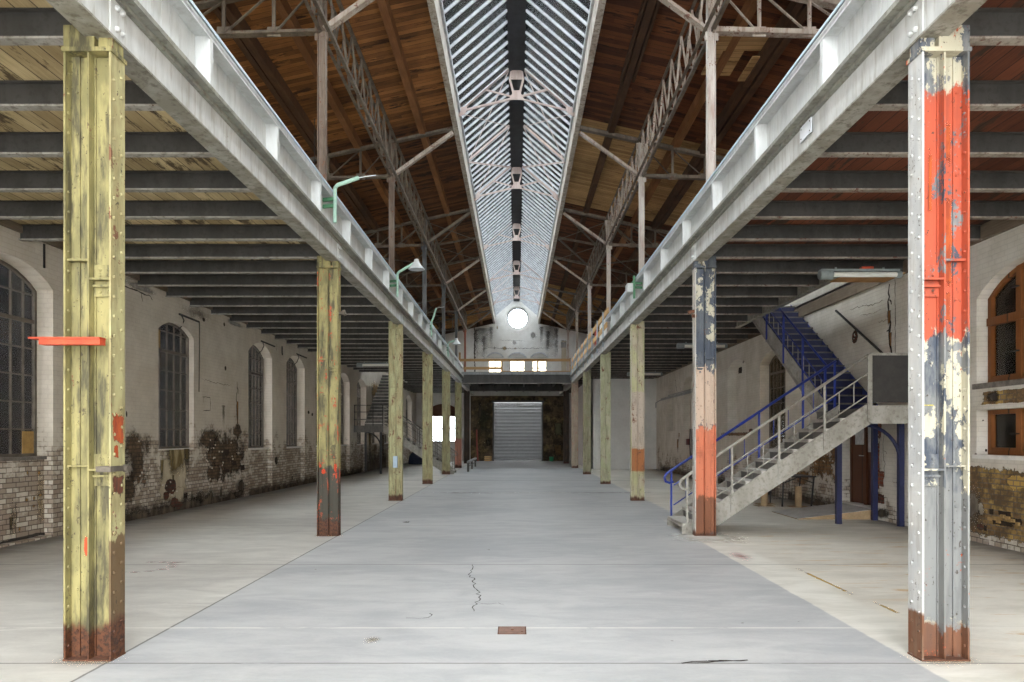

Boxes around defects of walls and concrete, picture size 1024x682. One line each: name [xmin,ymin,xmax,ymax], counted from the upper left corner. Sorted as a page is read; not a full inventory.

crack [852,283,896,353]
corrosion [112,413,124,458]
corrosion [113,475,124,494]
water stain [125,434,386,522]
spalling [987,509,1022,528]